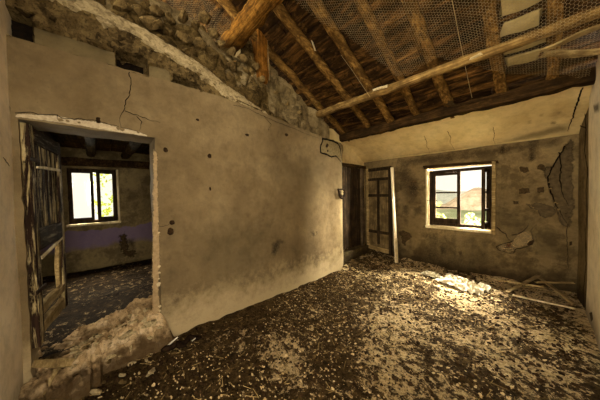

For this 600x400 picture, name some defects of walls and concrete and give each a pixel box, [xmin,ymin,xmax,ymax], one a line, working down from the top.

crack [17,72,160,131]
flaking render [519,139,575,227]
crack [567,87,588,308]